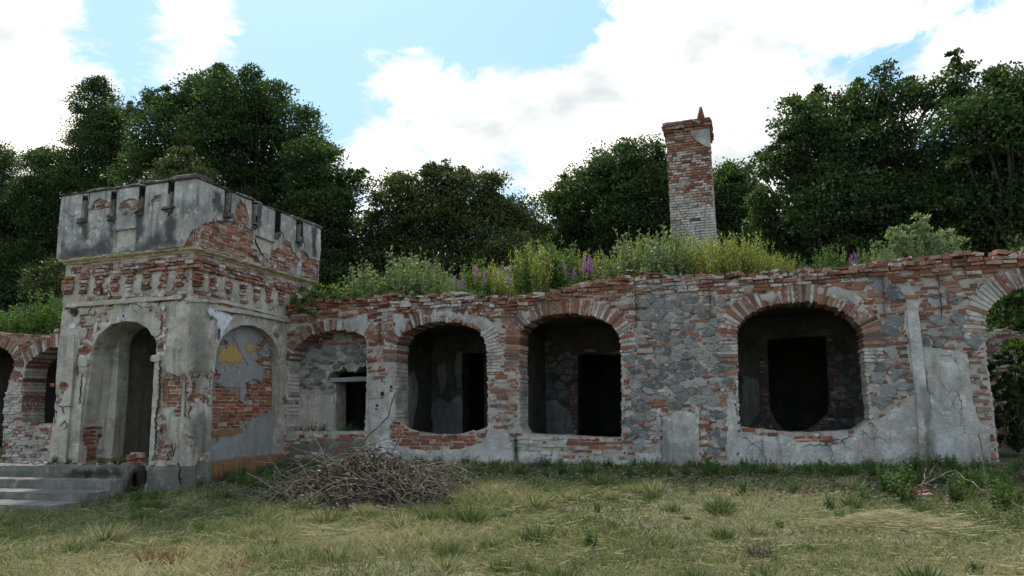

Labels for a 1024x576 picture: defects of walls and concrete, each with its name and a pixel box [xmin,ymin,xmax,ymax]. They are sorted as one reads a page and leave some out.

spalling [186,199,320,283]
crack [248,230,311,259]
spalling [152,338,273,463]
crack [924,363,962,419]
spalling [83,426,103,460]